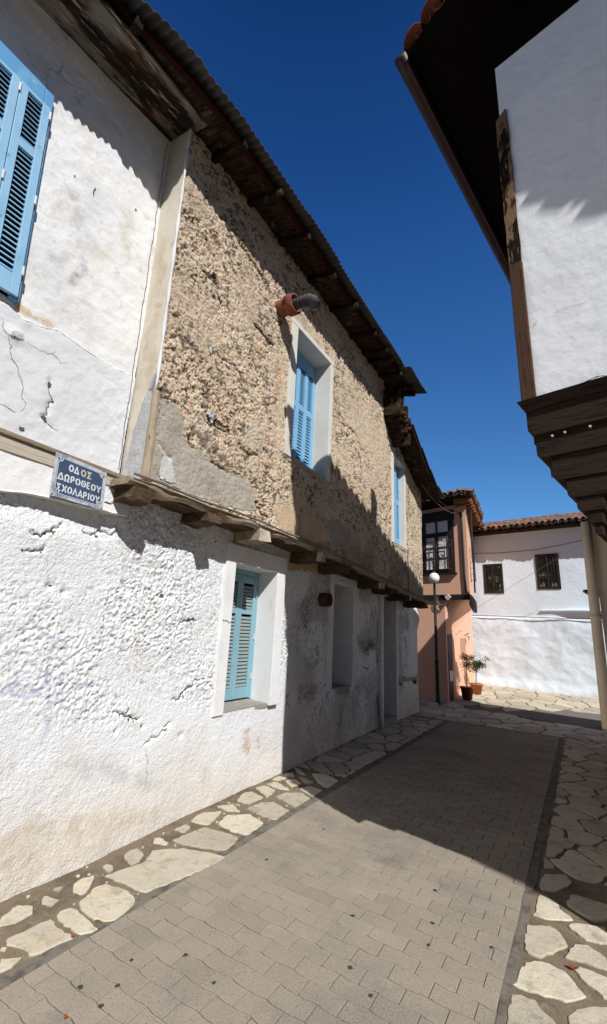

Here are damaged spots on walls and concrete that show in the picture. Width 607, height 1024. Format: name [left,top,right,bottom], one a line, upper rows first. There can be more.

crack [2,321,62,430]
spalling [123,372,256,512]
crack [113,707,167,780]